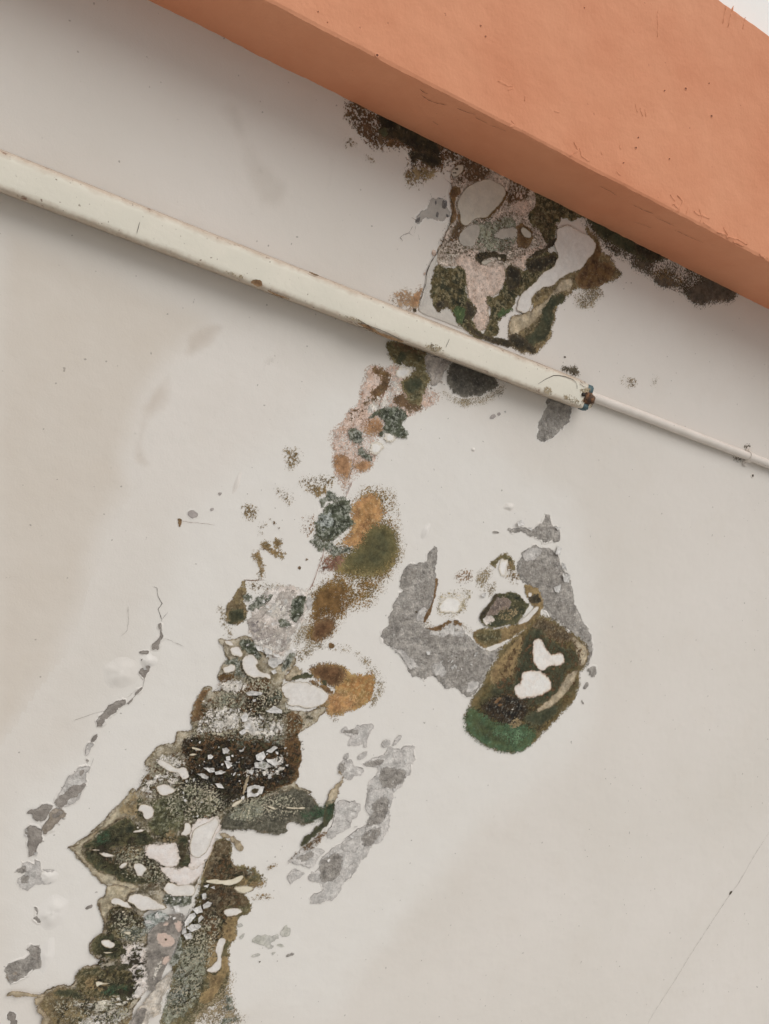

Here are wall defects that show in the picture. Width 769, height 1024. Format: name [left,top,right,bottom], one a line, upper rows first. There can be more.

mould [343,101,461,189]
flaking render [414,156,622,356]
mould [582,218,738,310]
spalling [535,397,574,444]
damp [0,197,633,1024]
spalling [379,546,502,699]
spalling [492,514,597,705]
peeling [287,722,417,905]
peeling [14,859,54,892]
peeling [31,906,42,925]
spalling [4,943,42,985]